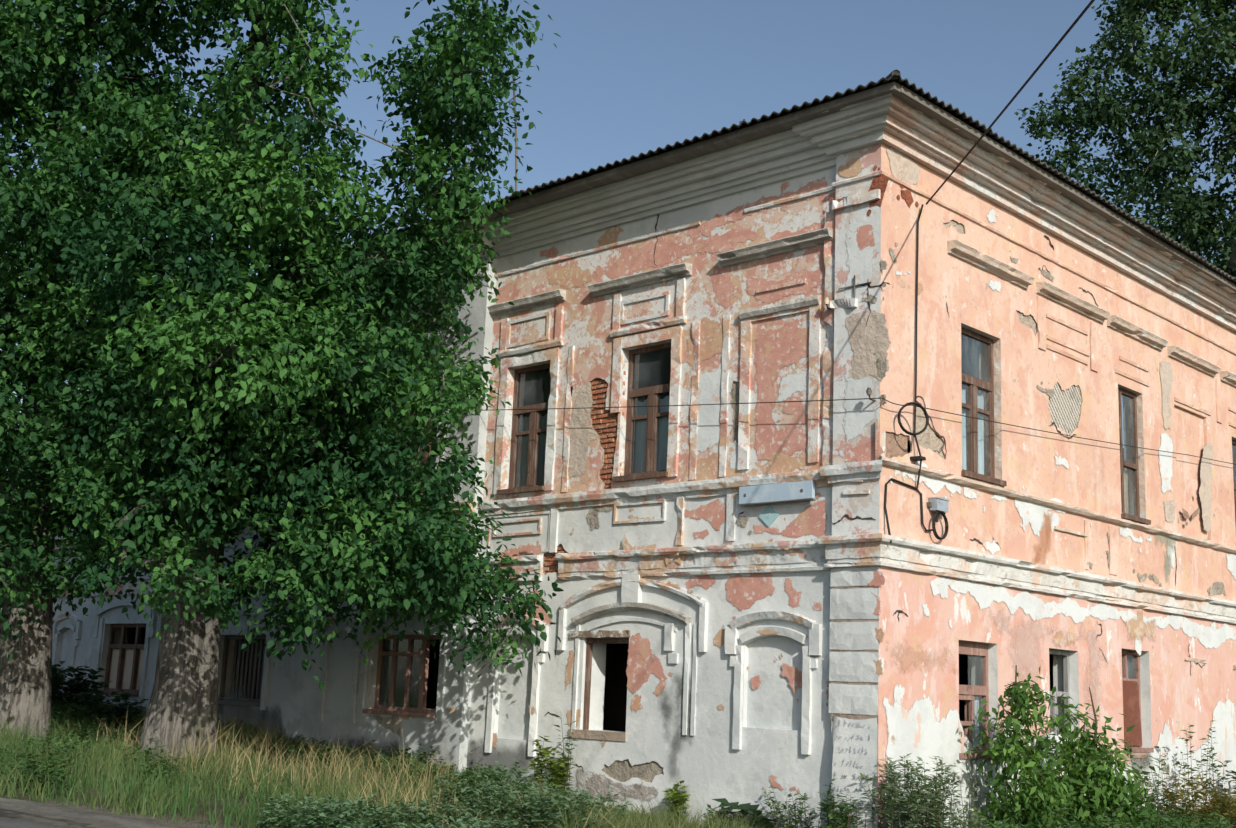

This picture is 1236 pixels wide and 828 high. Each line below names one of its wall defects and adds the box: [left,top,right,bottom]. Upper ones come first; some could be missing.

peeling [535,147,923,405]
flaking render [568,378,624,489]
peeling [684,492,827,559]
crack [831,514,876,524]
flaking render [502,529,574,575]
peeling [526,589,551,628]
peeling [586,503,822,649]
flaking render [1208,582,1226,596]
peeling [1125,612,1155,655]
peeling [626,633,673,713]
peeling [774,653,802,702]
peeling [576,769,658,802]